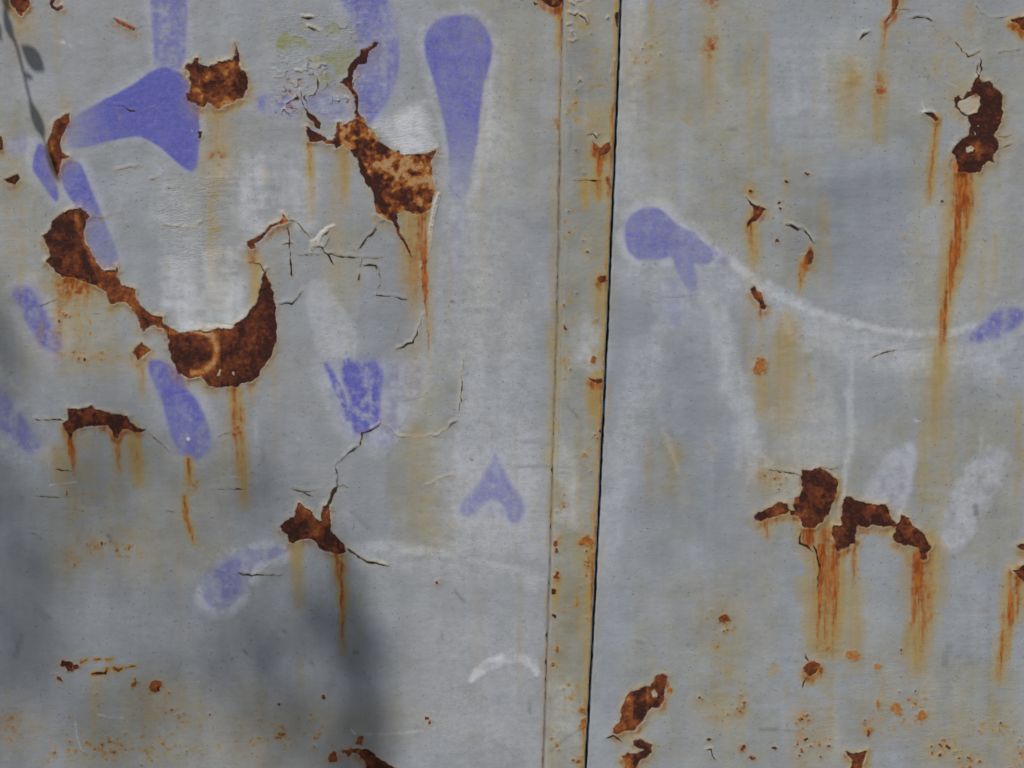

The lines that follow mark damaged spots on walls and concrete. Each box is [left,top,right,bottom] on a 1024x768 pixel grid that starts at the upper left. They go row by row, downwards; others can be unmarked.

corrosion [47,648,140,692]
corrosion [29,33,445,549]
crack [278,216,429,354]
crack [286,354,469,511]
corrosion [528,0,737,768]
corrosion [733,276,1024,768]
corrosion [912,61,1024,460]